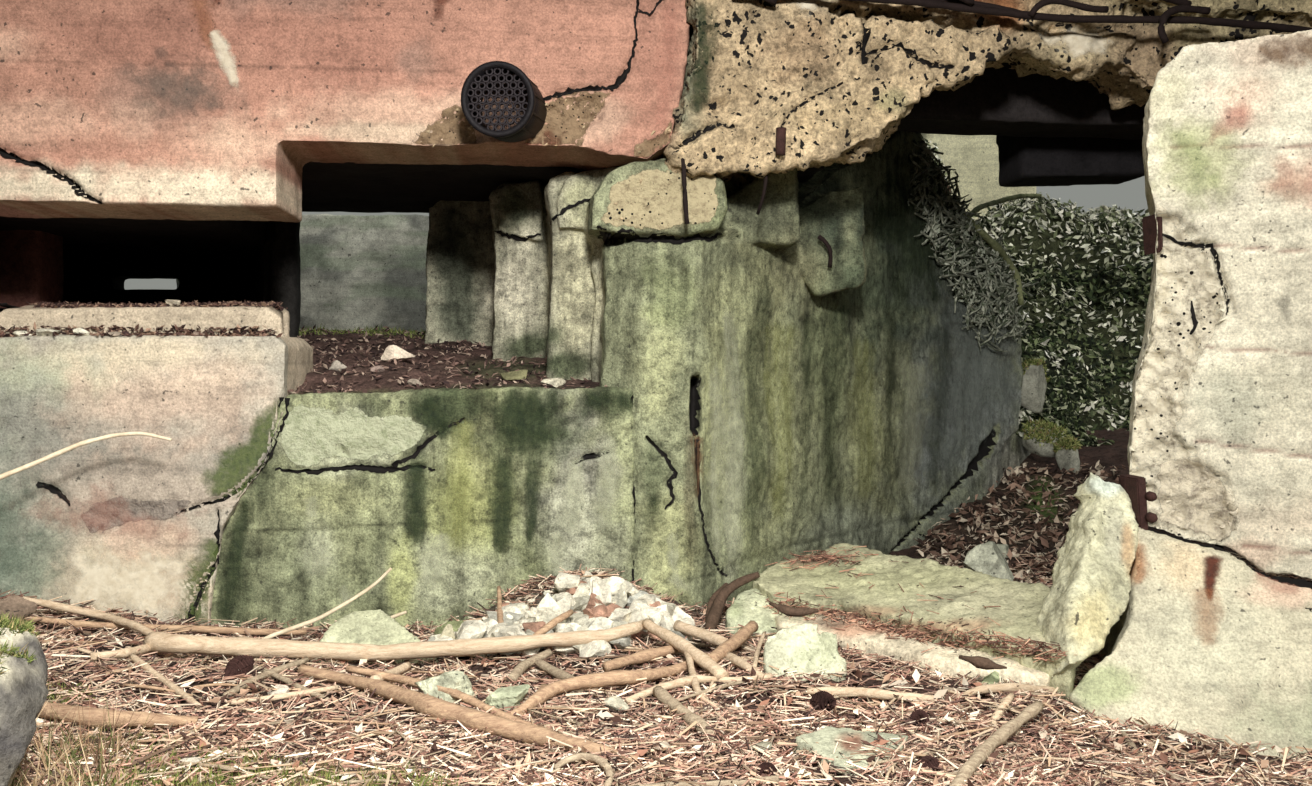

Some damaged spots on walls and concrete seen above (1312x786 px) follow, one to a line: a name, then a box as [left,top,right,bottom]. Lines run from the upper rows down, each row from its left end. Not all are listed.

crack [543,0,662,101]
spalling [844,0,1312,44]
crack [0,148,102,204]
crack [494,199,722,244]
spalling [775,127,786,156]
crack [1156,218,1230,335]
leakage [921,302,1014,469]
crack [176,397,465,622]
leakage [407,464,424,542]
leakage [492,458,539,552]
crack [632,378,728,583]
crack [1149,529,1312,612]